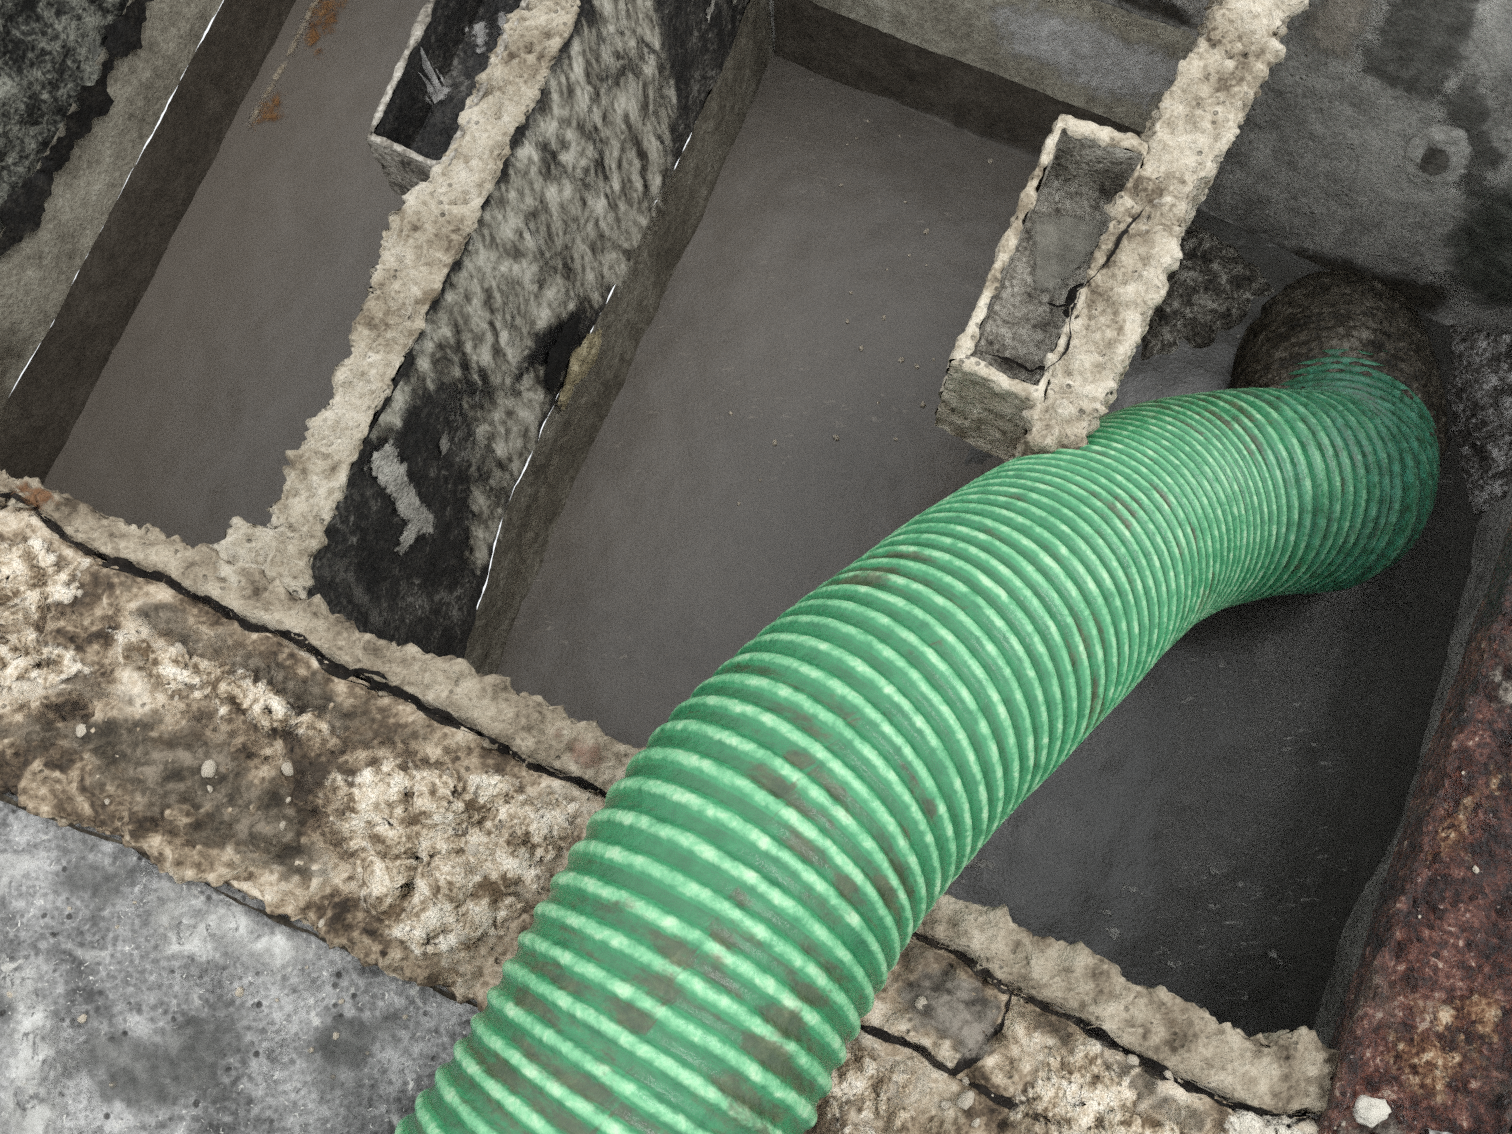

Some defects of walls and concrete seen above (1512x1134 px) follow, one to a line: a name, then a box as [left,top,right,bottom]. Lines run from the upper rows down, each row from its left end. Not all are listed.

rust [251,0,346,122]
leakage [1117,0,1196,28]
leakage [1248,0,1512,313]
crack [959,205,1147,372]
crack [0,492,607,797]
leakage [333,559,387,627]
rust [1490,644,1512,708]
rust [1429,773,1501,856]
leakage [154,890,311,977]
crack [861,932,1314,1129]
rust [1385,991,1504,1102]
rust [1336,1119,1401,1134]